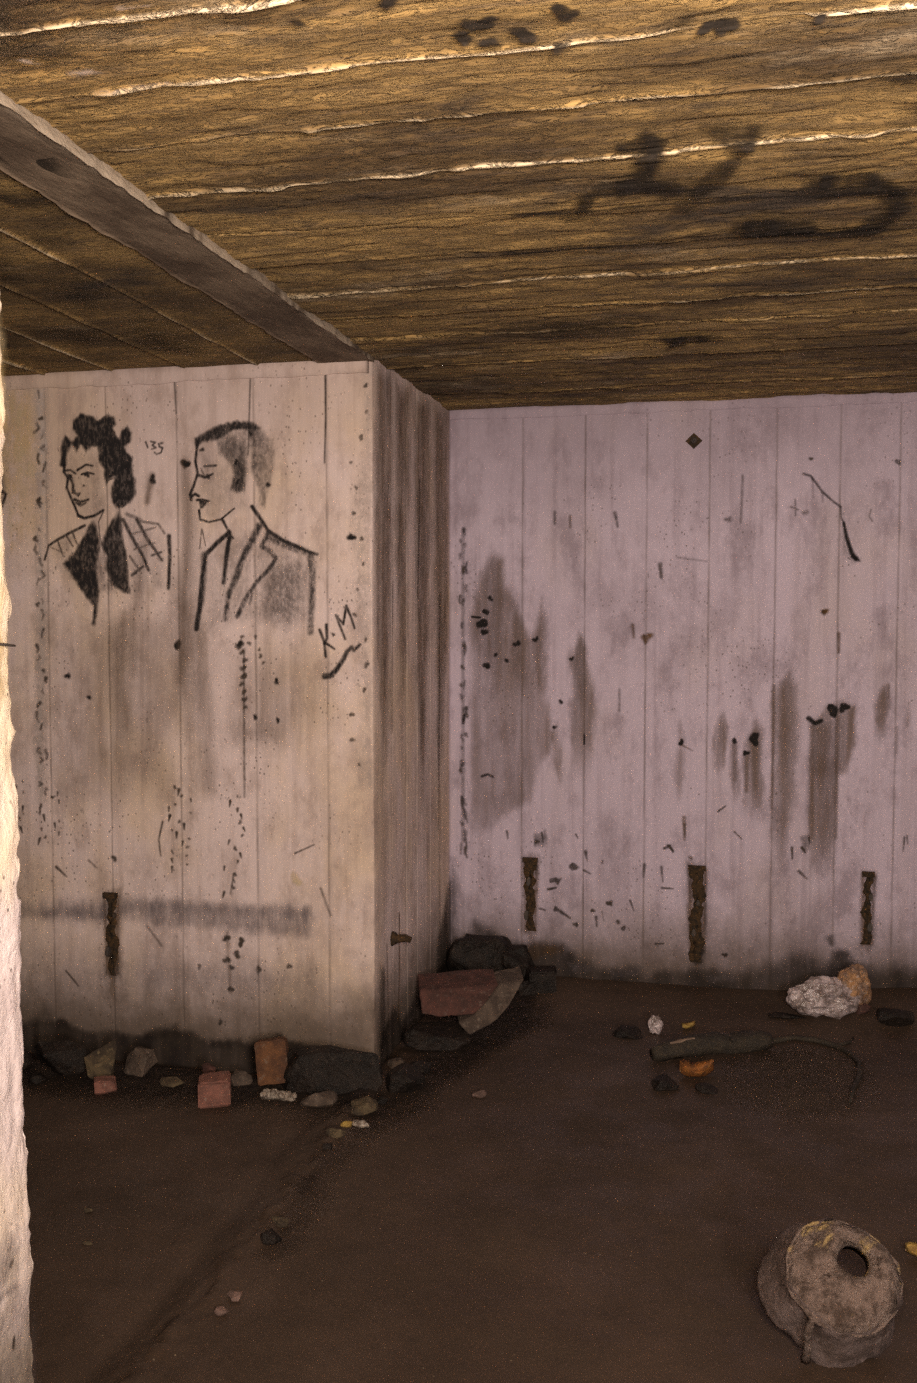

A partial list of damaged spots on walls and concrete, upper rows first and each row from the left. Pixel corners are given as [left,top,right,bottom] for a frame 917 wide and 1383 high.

leakage [382,389,446,694]
leakage [471,596,493,635]
leakage [483,636,538,669]
leakage [724,730,759,764]
leakage [807,703,854,759]
corrosion [102,892,120,976]
corrosion [523,857,538,931]
corrosion [688,865,706,964]
corrosion [860,871,875,945]
leakage [381,997,425,1065]